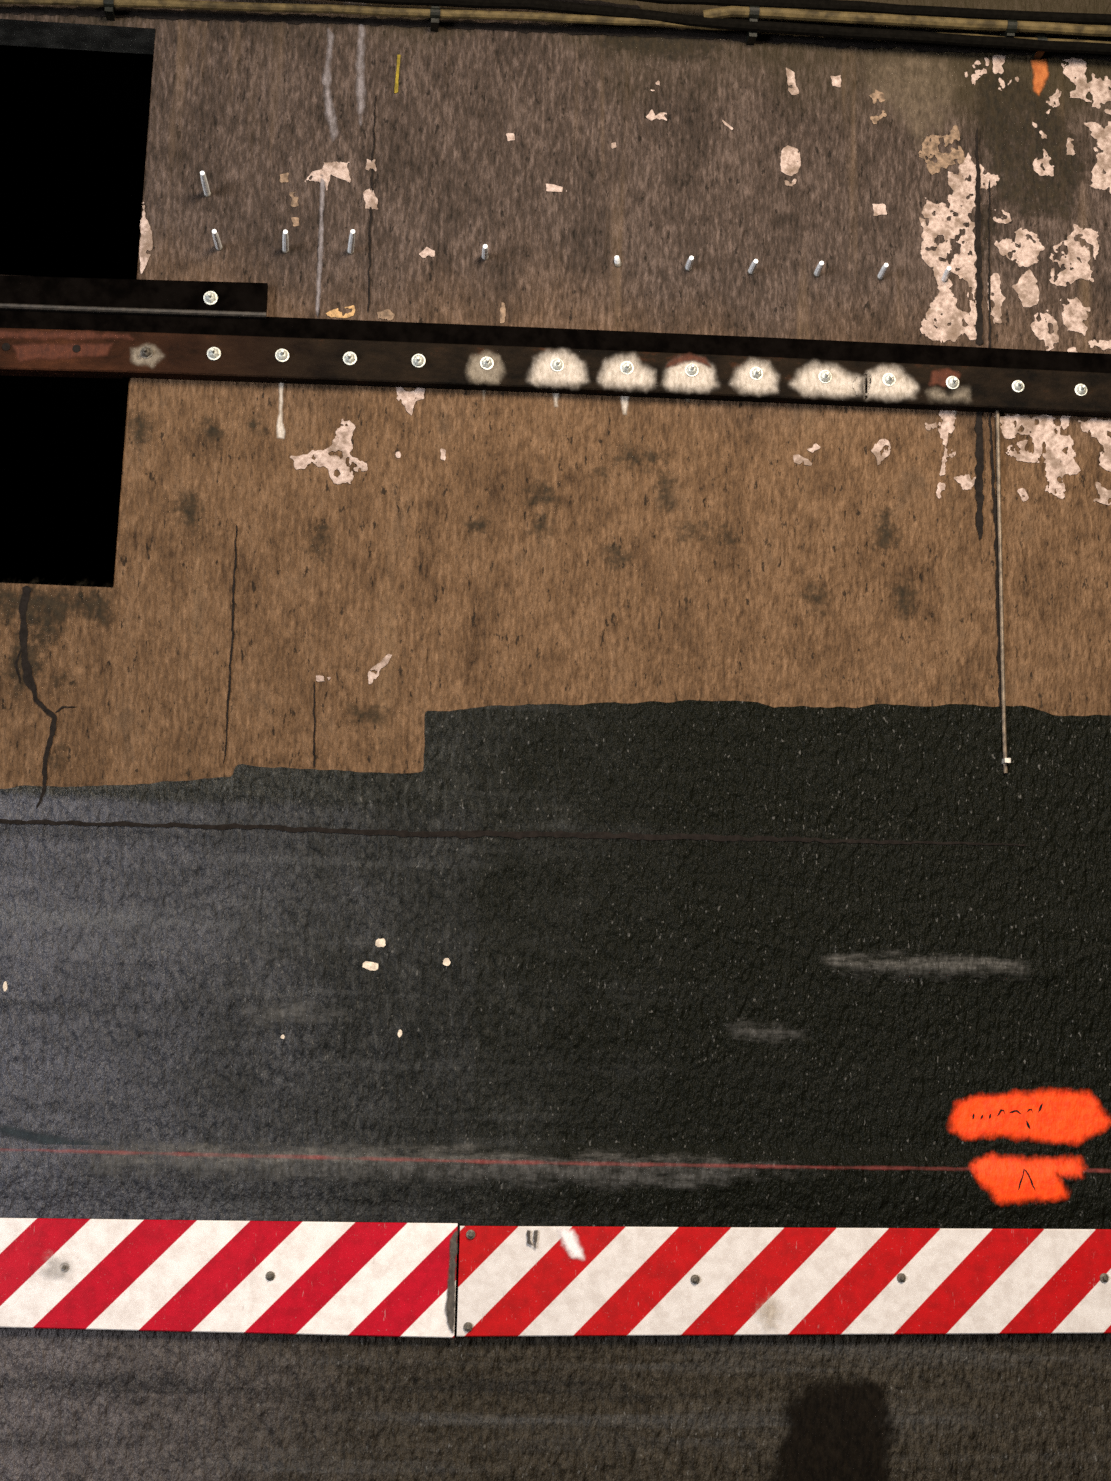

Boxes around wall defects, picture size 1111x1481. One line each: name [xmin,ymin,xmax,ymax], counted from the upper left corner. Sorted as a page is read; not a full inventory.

peeling [965,55,1019,91]
peeling [869,89,887,124]
peeling [1032,58,1111,194]
peeling [919,125,1111,352]
corrosion [0,330,132,362]
damp [468,352,502,396]
damp [531,351,715,414]
damp [734,362,967,412]
peeling [290,419,368,484]
peeling [994,414,1111,505]
crack [223,525,238,763]
crack [0,586,1025,846]